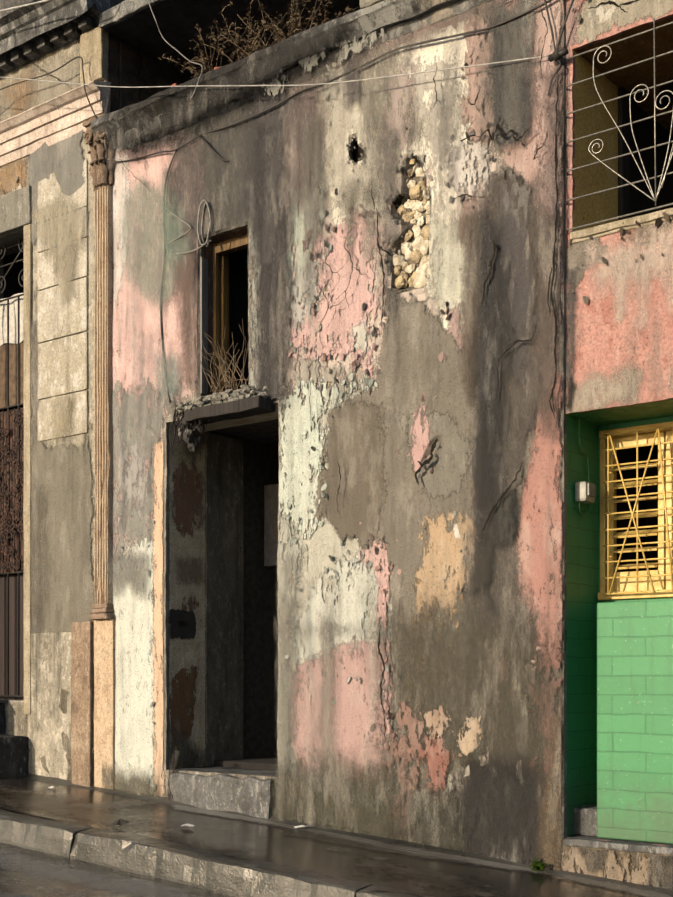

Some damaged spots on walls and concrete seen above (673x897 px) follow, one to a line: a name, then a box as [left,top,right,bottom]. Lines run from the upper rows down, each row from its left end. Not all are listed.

crack [589,0,638,12]
crack [460,9,559,418]
crack [314,181,399,346]
corrosion [169,459,206,537]
spalling [277,2,530,839]
leakage [271,0,576,871]
crack [415,439,438,485]
crack [482,462,523,530]
corrosion [169,664,199,748]